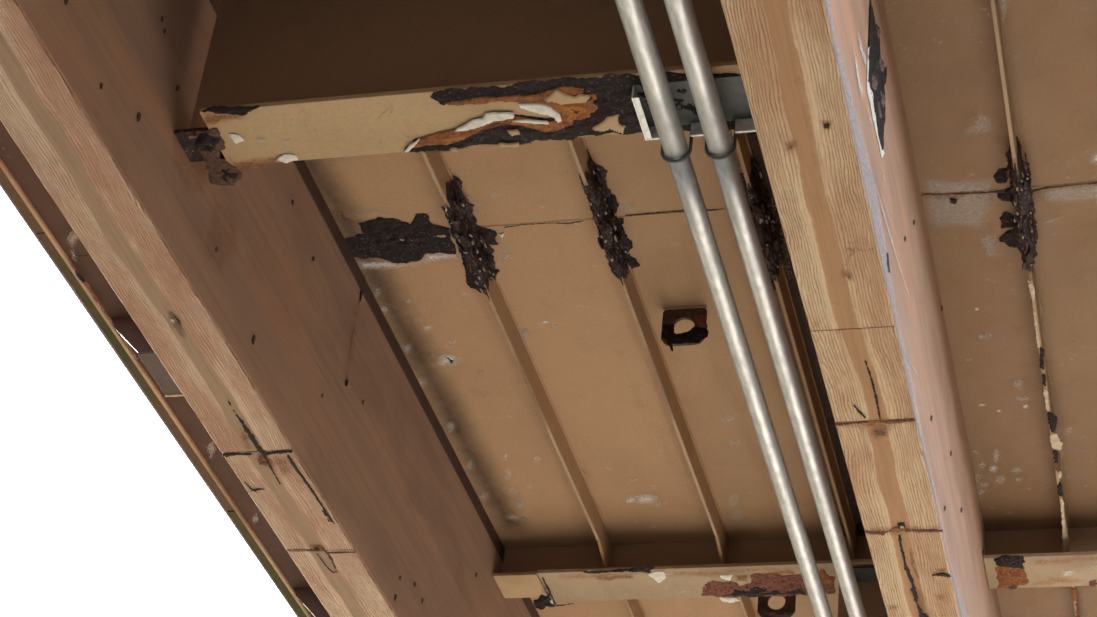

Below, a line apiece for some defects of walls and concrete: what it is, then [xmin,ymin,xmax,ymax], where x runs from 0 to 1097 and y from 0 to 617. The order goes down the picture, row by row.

corrosion [402,73,649,153]
corrosion [665,71,698,131]
peeling [277,141,298,163]
peeling [345,212,456,268]
spalling [826,0,933,487]
crack [835,361,916,426]
crack [222,401,335,524]
crack [287,548,355,573]
corrosion [702,571,808,598]
corrosion [819,569,836,594]
crack [865,527,943,617]
corrosion [994,555,1029,590]